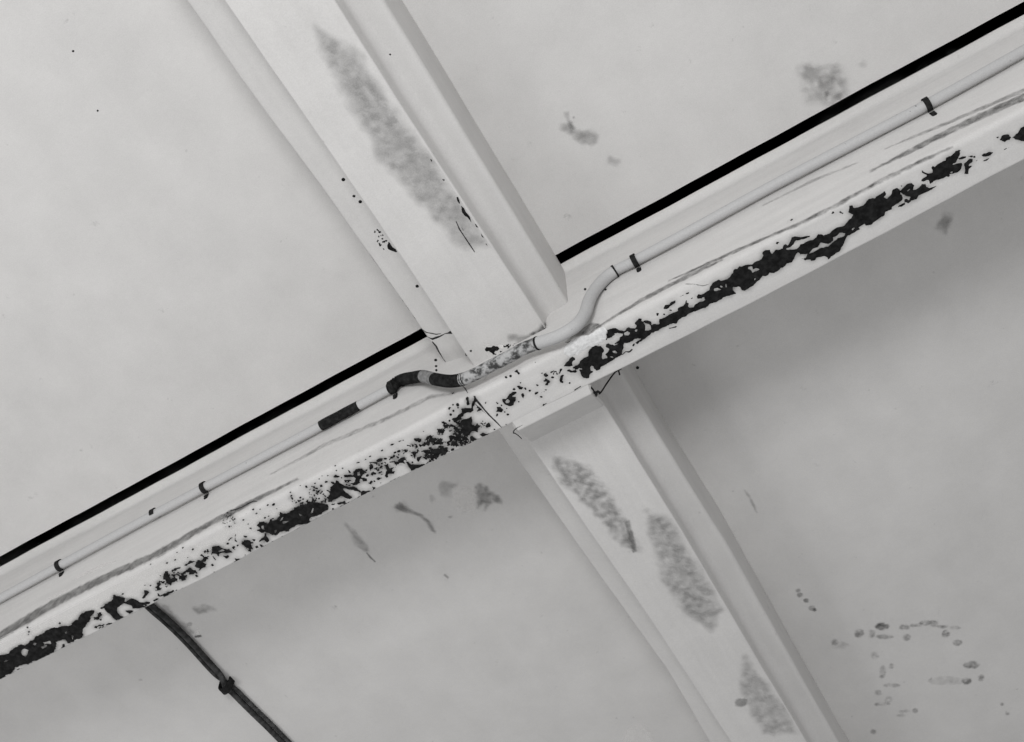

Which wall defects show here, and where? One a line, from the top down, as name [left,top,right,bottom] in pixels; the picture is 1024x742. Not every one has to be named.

peeling [559,127,1024,383]